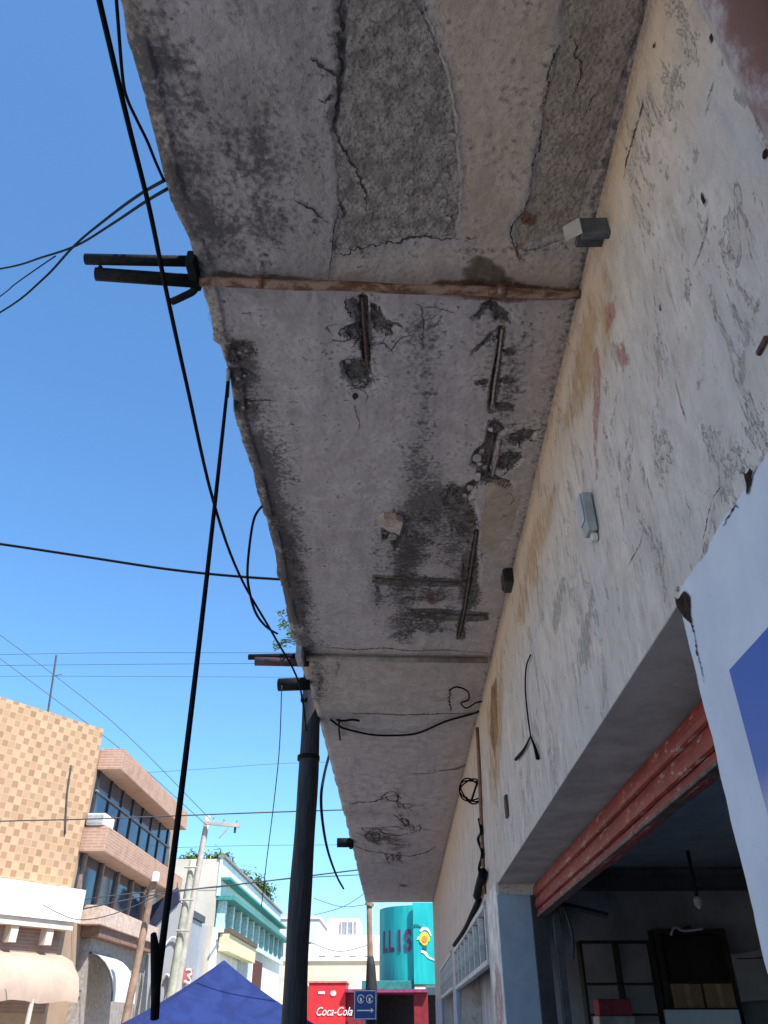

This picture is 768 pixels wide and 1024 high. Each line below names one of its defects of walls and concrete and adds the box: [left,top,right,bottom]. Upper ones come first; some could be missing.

crack [294,0,474,280]
crack [510,39,596,262]
spalling [338,292,403,389]
corrosion [198,276,581,313]
water stain [464,257,531,288]
spalling [372,299,542,639]
water stain [387,510,452,641]
crack [352,772,437,865]